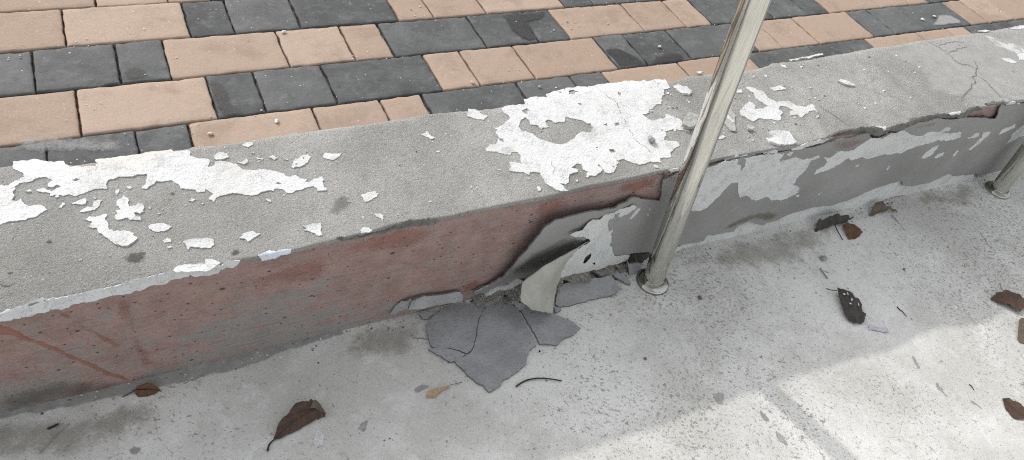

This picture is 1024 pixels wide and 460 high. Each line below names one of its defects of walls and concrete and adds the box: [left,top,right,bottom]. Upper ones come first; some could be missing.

peeling [467,79,692,192]
peeling [691,75,1024,211]
crack [821,107,910,138]
crack [933,41,999,118]
peeling [0,142,341,322]
peeling [361,191,377,203]
spalling [336,213,437,241]
spalling [389,205,650,393]
peeling [0,331,342,418]